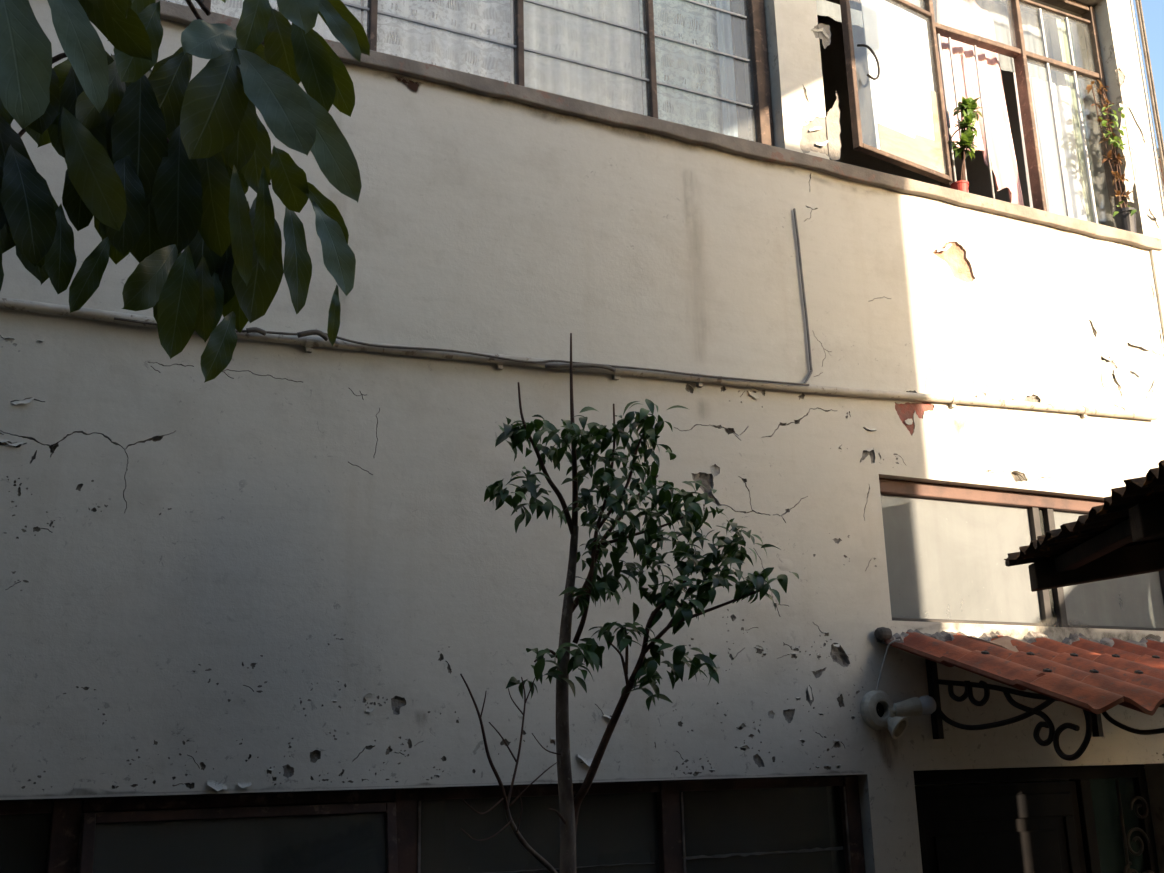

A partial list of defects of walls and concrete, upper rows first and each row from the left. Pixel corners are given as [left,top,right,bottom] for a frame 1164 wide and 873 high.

peeling [800,91,842,161]
peeling [1119,103,1149,203]
flaking render [933,241,976,282]
crack [1059,307,1097,338]
peeling [1100,342,1164,398]
crack [11,397,45,405]
crack [674,407,877,439]
flaking render [895,390,934,435]
crack [0,430,175,513]
crack [721,476,806,523]
crack [983,470,1062,485]
flaking render [703,609,863,770]